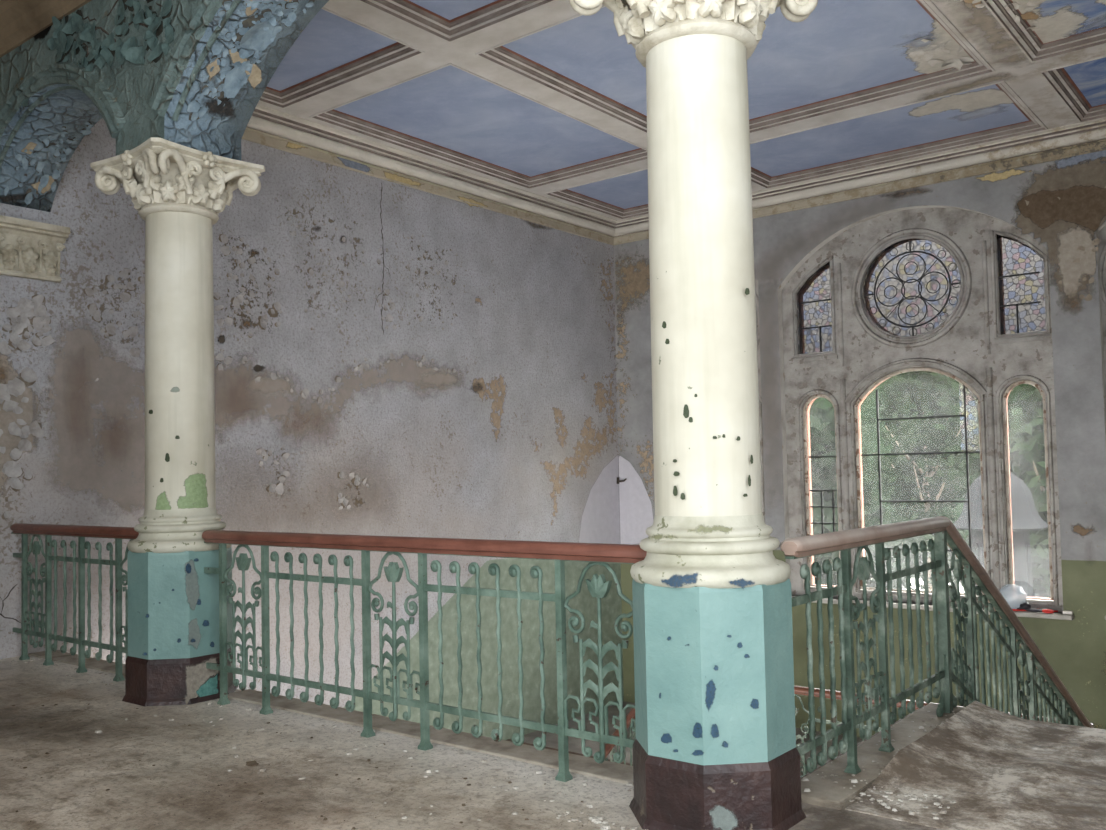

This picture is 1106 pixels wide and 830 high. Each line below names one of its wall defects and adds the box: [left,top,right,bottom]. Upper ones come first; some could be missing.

peeling [905,20,975,74]
peeling [954,0,1106,62]
peeling [0,121,94,204]
flaking render [213,234,458,433]
peeling [0,294,55,520]
peeling [156,474,208,510]
peeling [689,525,732,533]
peeling [661,573,698,588]
peeling [729,578,755,589]
peeling [705,665,718,710]
peeling [692,723,728,756]
peeling [710,806,737,830]